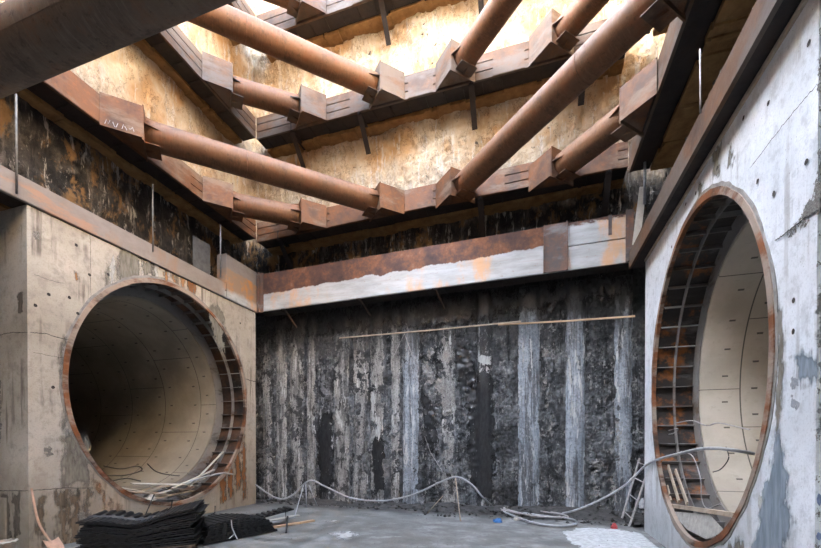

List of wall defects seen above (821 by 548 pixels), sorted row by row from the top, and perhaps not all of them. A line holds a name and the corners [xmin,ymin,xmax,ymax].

crack [775,210,818,241]
corrosion [220,434,247,503]
water stain [315,411,334,499]
water stain [370,390,386,493]